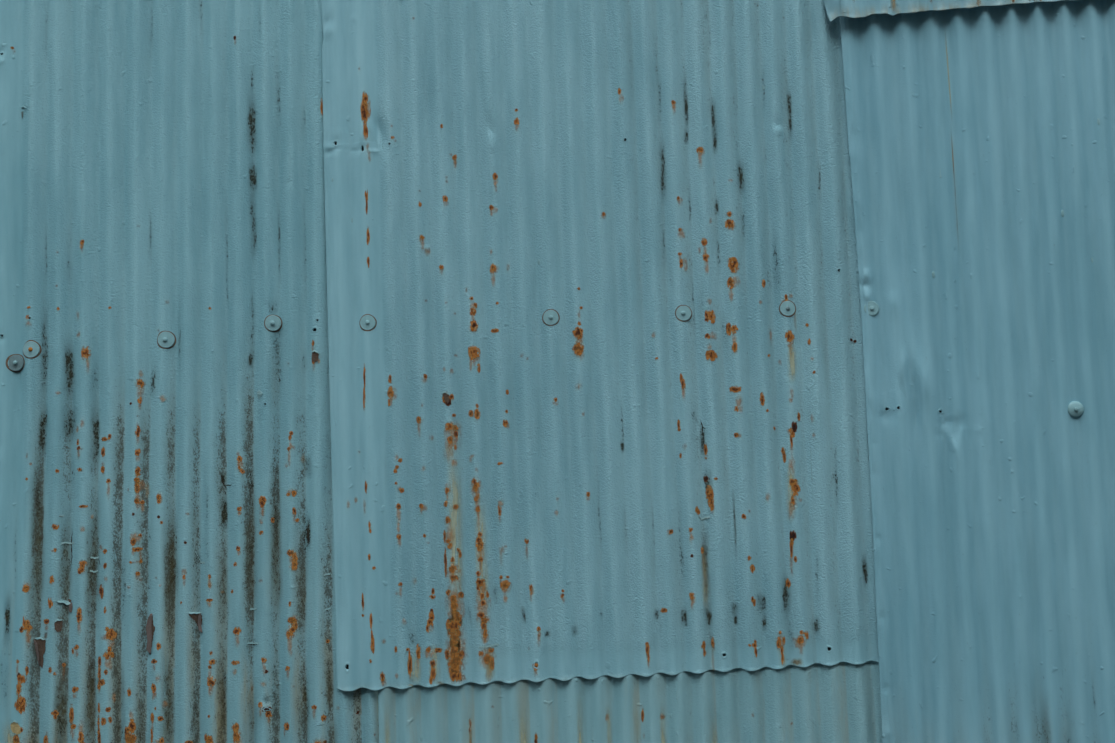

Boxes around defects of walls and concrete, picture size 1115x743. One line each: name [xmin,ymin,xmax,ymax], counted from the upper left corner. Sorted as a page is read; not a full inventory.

rust [360,91,371,139]
rust [727,257,740,289]
rust [572,306,584,356]
rust [705,310,738,361]
rust [442,394,480,450]
rust [773,412,800,463]
rust [132,426,163,524]
rust [695,476,718,515]
rust [476,532,510,670]
rust [362,593,385,681]
rust [14,659,29,714]
rust [51,703,112,743]